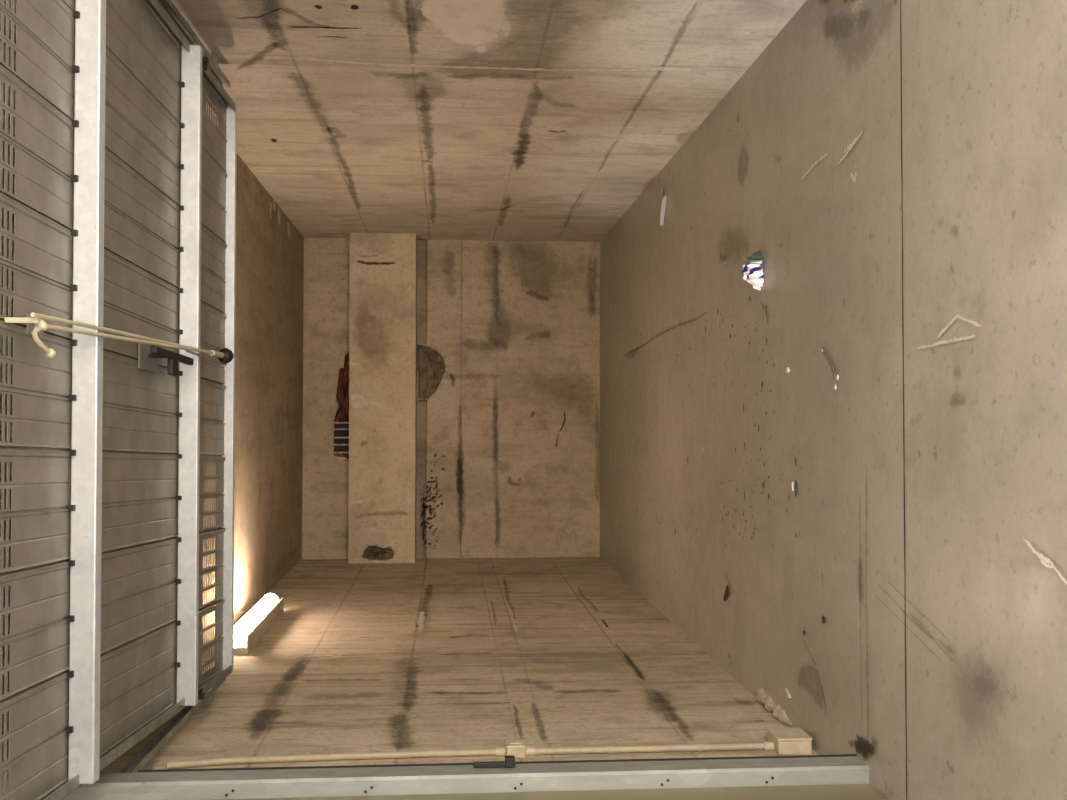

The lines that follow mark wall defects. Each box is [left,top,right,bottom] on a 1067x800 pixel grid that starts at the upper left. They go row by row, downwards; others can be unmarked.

water stain [420,454,463,549]